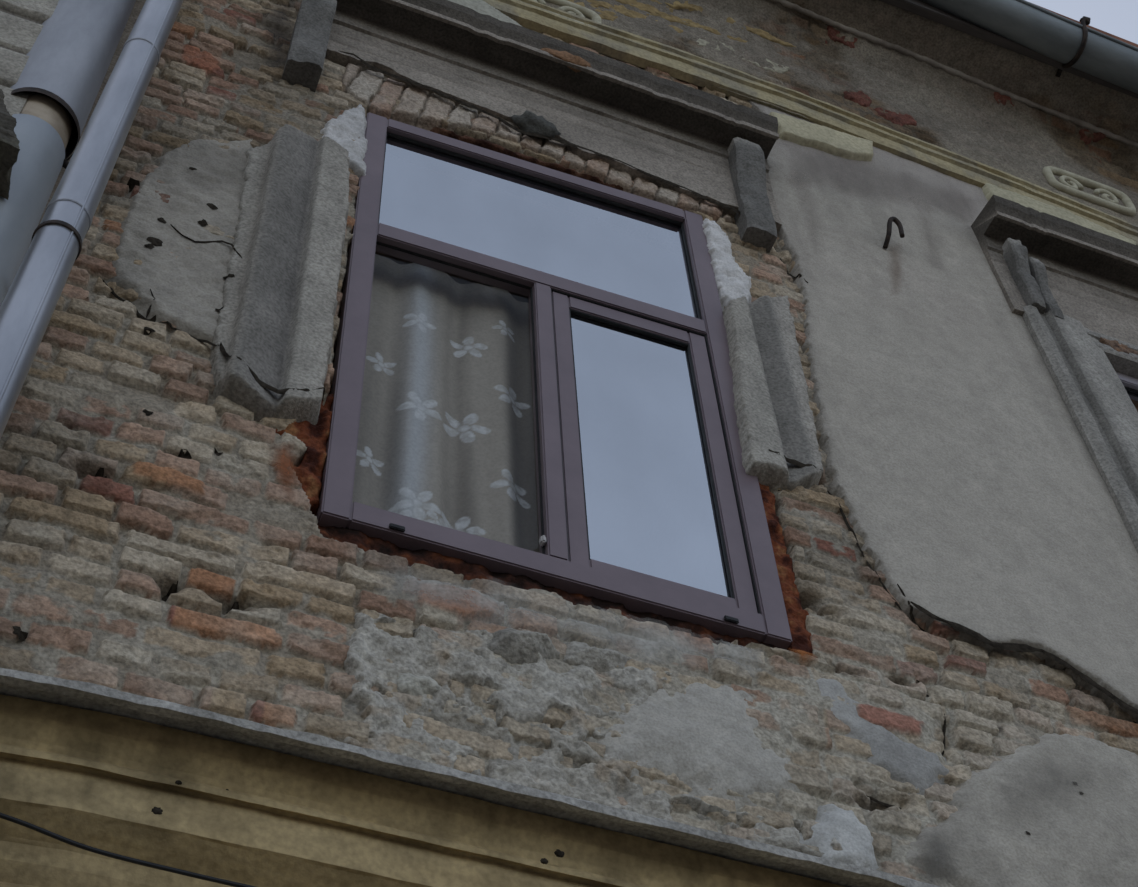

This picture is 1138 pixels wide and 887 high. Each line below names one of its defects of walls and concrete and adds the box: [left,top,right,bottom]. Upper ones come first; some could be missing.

peeling [567,0,804,73]
spalling [127,177,140,192]
spalling [144,237,163,249]
crack [171,225,242,258]
crack [103,280,325,401]
spalling [162,581,178,601]
crack [769,449,1138,724]
spalling [12,626,28,641]
crack [916,680,946,756]
spalling [342,613,843,857]
crack [866,795,901,809]
peeling [540,849,565,864]